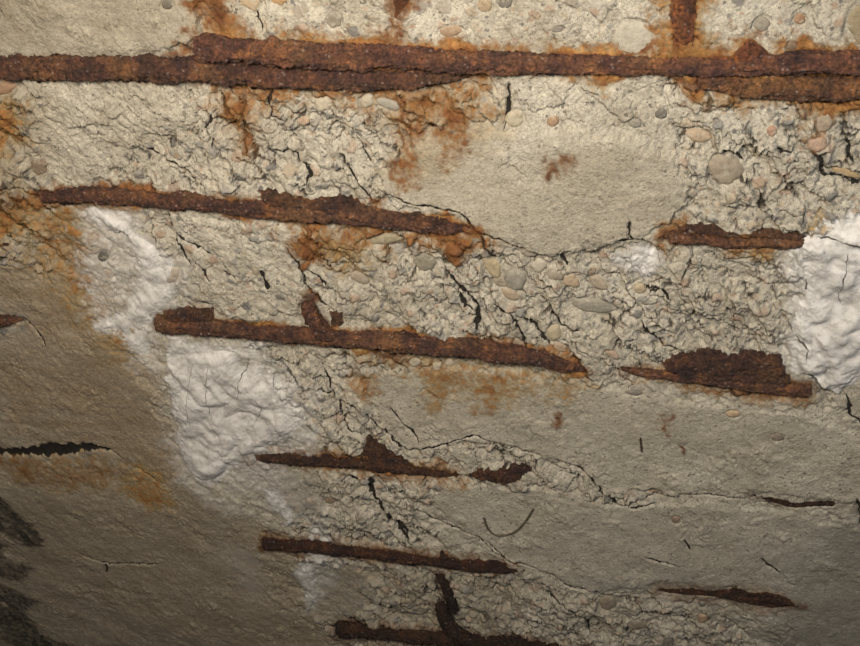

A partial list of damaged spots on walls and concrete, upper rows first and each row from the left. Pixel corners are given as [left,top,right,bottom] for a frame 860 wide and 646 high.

spalling [95,76,524,222]
rust [0,0,860,192]
spalling [655,76,860,237]
crack [777,138,860,184]
damp [0,499,43,546]
crack [0,442,128,462]
efflorescence [79,207,316,487]
rust [0,180,495,361]
rust [150,289,587,409]
spalling [143,211,804,550]
crack [446,269,580,346]
efflorescence [779,212,860,394]